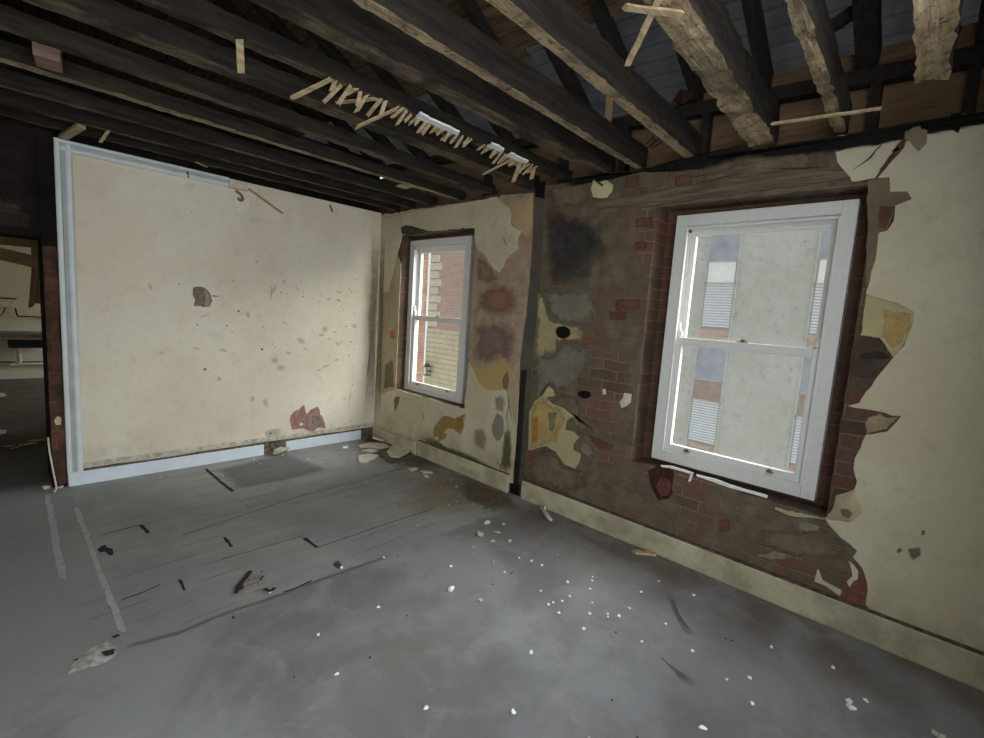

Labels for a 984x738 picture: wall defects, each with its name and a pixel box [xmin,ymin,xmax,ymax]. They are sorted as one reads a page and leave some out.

flaking render [904,126,928,152]
crack [853,136,907,179]
flaking render [401,225,428,234]
flaking render [193,287,219,307]
flaking render [378,254,401,410]
flaking render [468,148,914,607]
peeling [265,405,326,437]
damp [502,432,511,468]